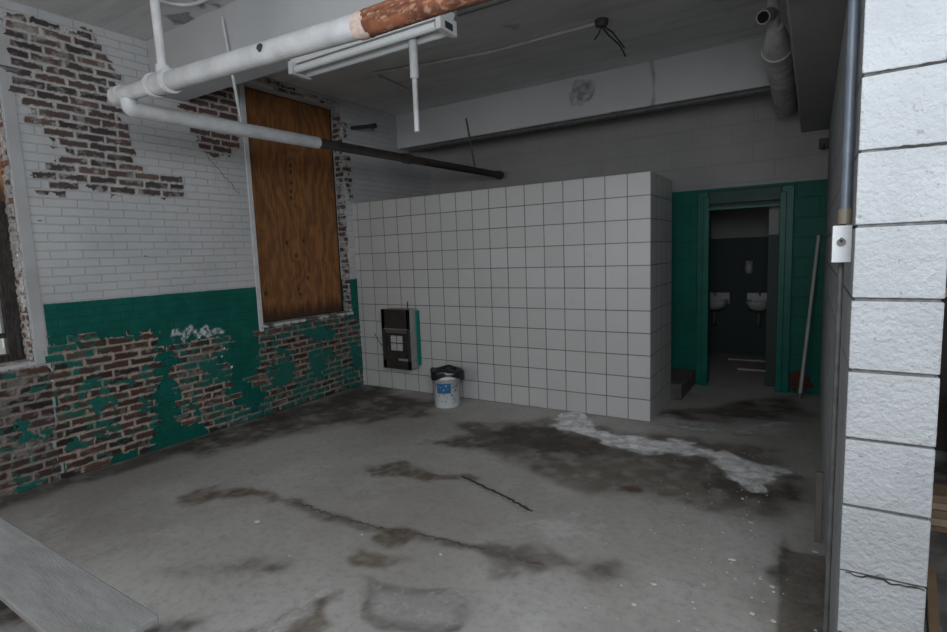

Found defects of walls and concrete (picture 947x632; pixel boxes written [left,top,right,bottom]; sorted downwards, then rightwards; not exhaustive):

spalling [0,10,185,200]
corrosion [360,0,487,37]
peeling [0,77,364,499]
water stain [436,399,800,513]